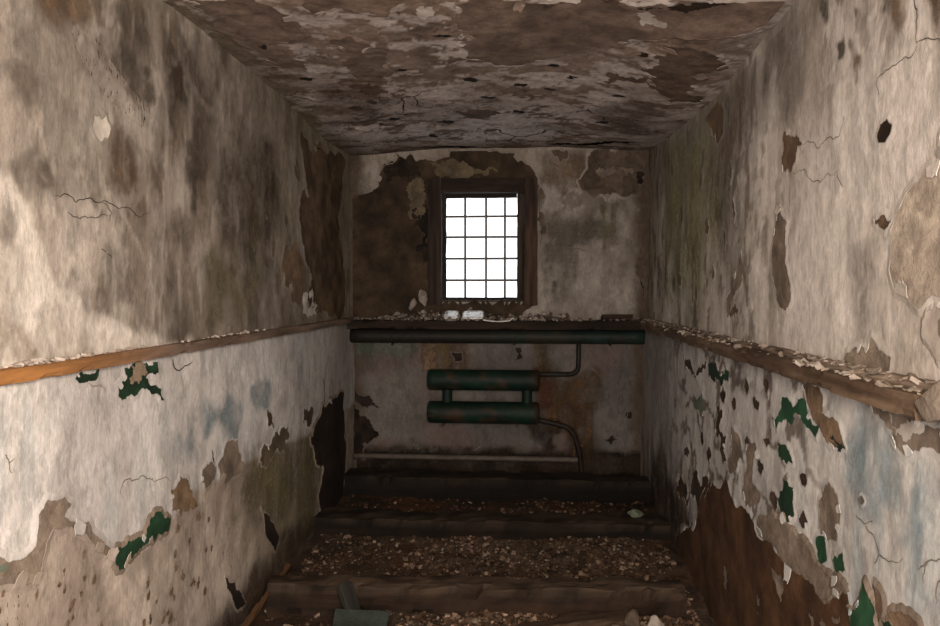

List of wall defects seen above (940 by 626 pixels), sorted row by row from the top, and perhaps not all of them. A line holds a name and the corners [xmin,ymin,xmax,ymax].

water stain [111,47,154,103]
peeling [181,0,786,148]
crack [876,0,940,91]
water stain [28,153,54,188]
crack [56,193,150,219]
water stain [185,137,202,196]
crack [789,169,842,206]
spalling [280,125,940,395]
spalling [302,362,382,512]
spalling [0,436,247,626]
spalling [675,354,924,626]
crack [857,517,940,604]